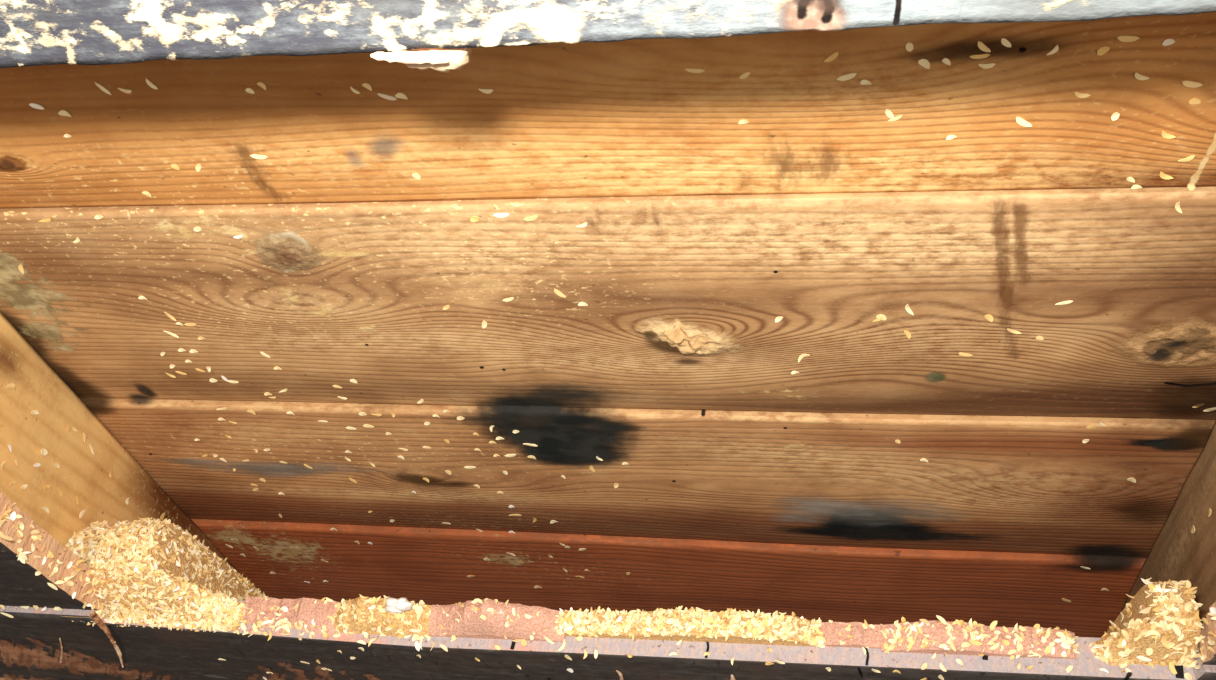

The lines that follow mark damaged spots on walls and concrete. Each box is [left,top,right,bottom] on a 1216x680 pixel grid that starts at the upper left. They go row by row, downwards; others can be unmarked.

peeling [0,0,597,73]
leakage [994,207,1026,301]
leakage [467,387,636,466]
leakage [787,503,978,540]